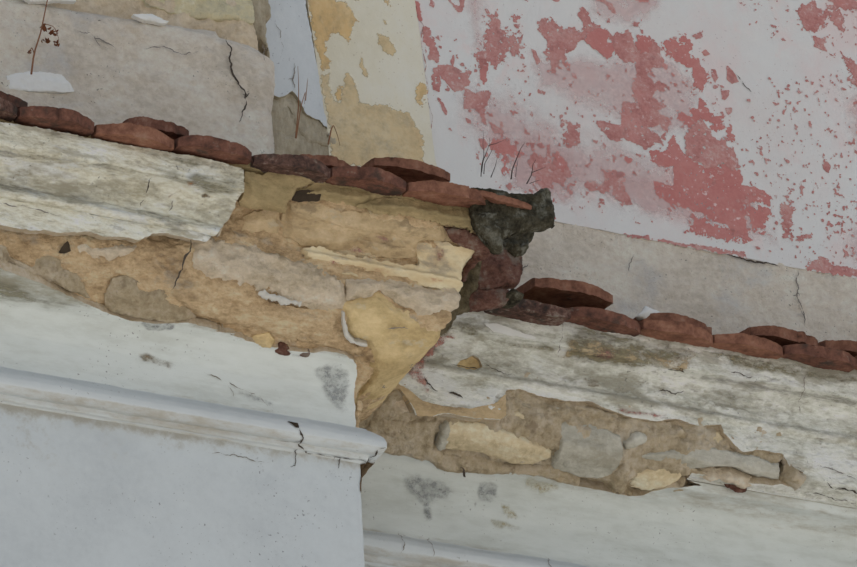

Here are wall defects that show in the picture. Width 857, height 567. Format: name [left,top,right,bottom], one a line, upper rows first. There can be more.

crack [226,41,249,122]
peeling [271,0,425,166]
peeling [415,0,857,277]
spalling [0,171,806,496]
crack [727,254,777,266]
crack [793,272,806,323]
crack [285,421,383,468]